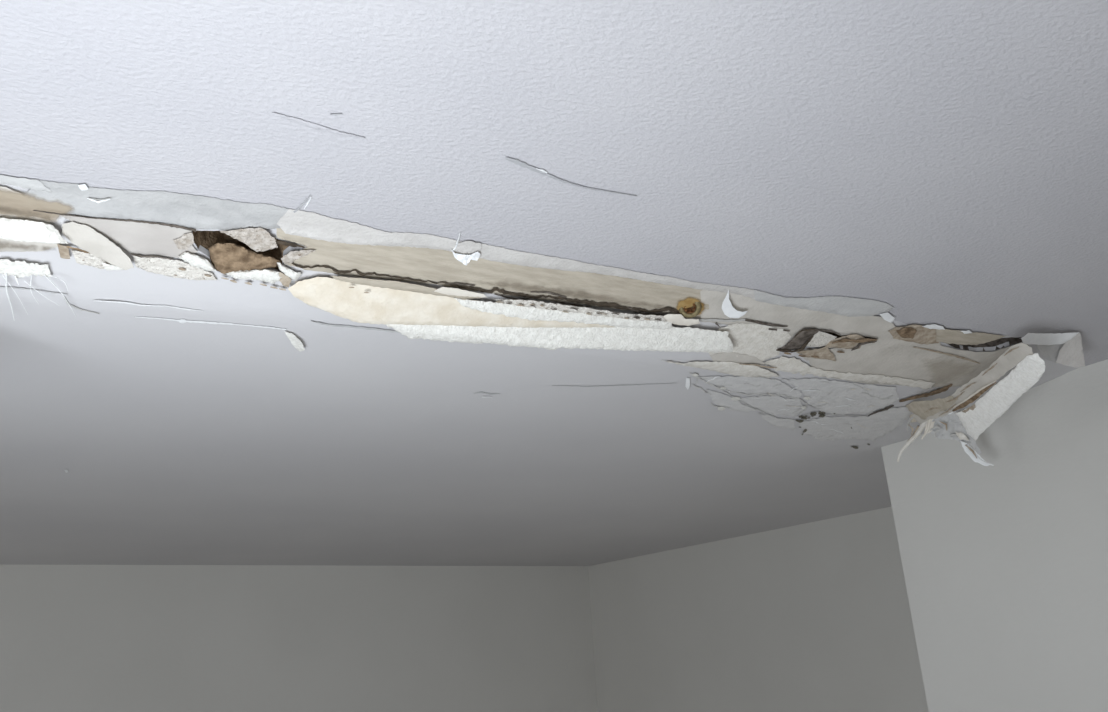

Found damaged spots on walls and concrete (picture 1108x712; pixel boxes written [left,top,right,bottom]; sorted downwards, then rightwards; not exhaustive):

spalling [505,157,636,196]
spalling [0,175,1029,441]
crack [552,372,953,420]